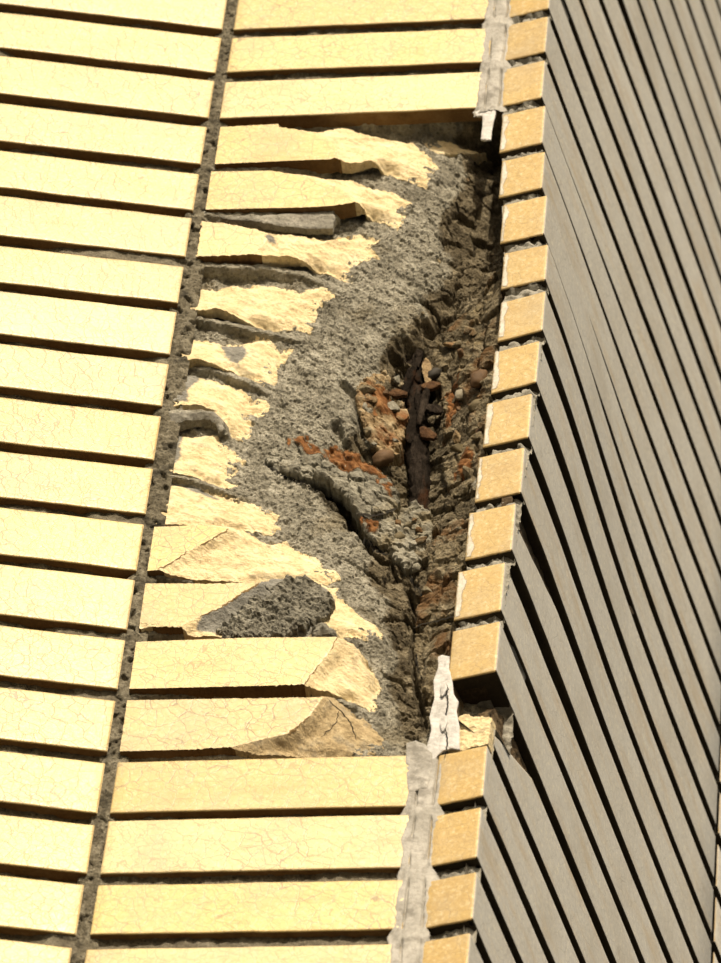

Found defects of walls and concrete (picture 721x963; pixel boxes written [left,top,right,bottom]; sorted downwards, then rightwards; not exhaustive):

corrosion [372,349,461,446]
crack [265,464,333,502]
corrosion [287,435,393,497]
spalling [120,110,609,963]
crack [349,508,454,679]
crack [323,701,356,739]